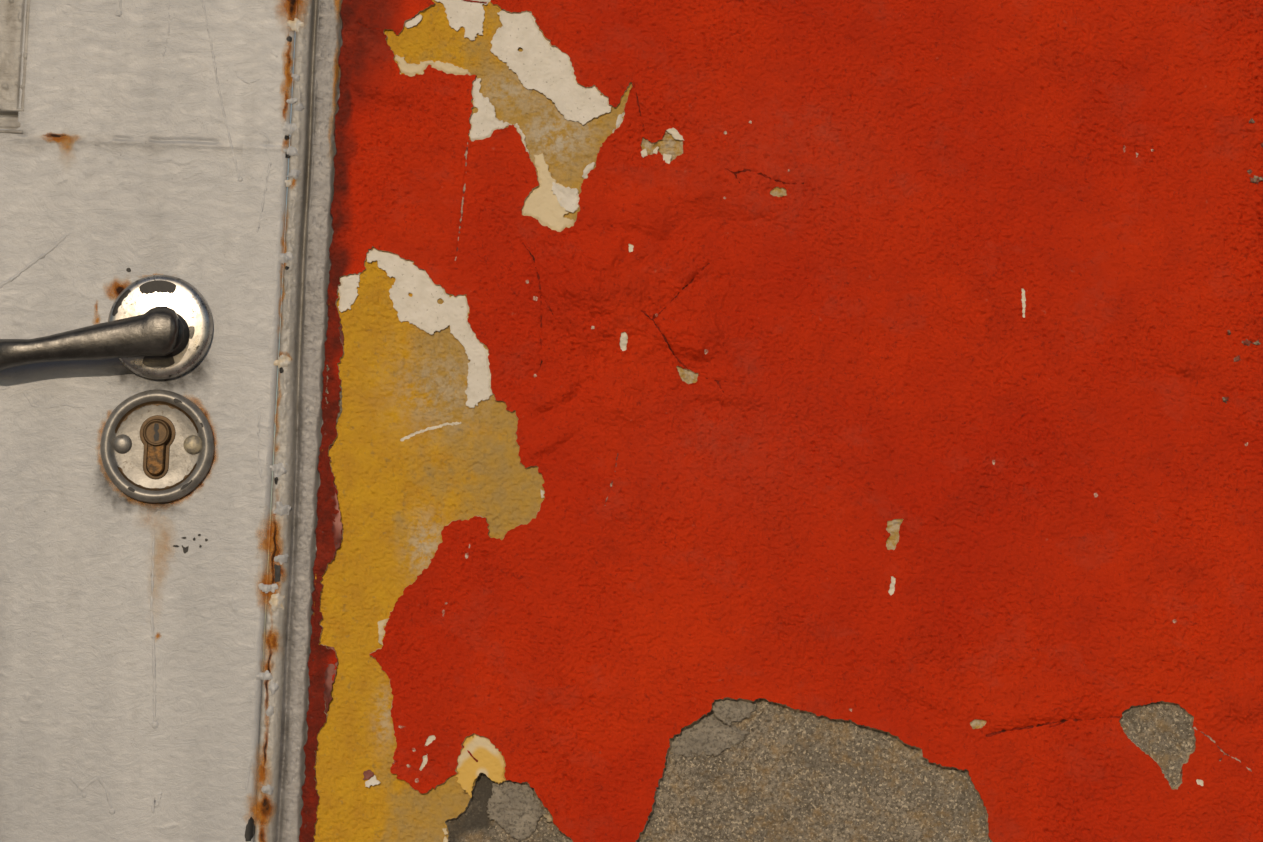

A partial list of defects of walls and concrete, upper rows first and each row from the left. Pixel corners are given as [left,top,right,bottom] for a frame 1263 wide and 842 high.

corrosion [281,0,304,21]
corrosion [46,134,73,148]
corrosion [282,44,293,117]
peeling [383,0,632,232]
peeling [641,128,684,164]
corrosion [260,521,284,604]
peeling [304,246,573,842]
peeling [886,519,904,550]
corrosion [251,733,272,842]
spalling [636,697,993,842]
crack [986,716,1120,737]
spalling [1119,701,1204,790]